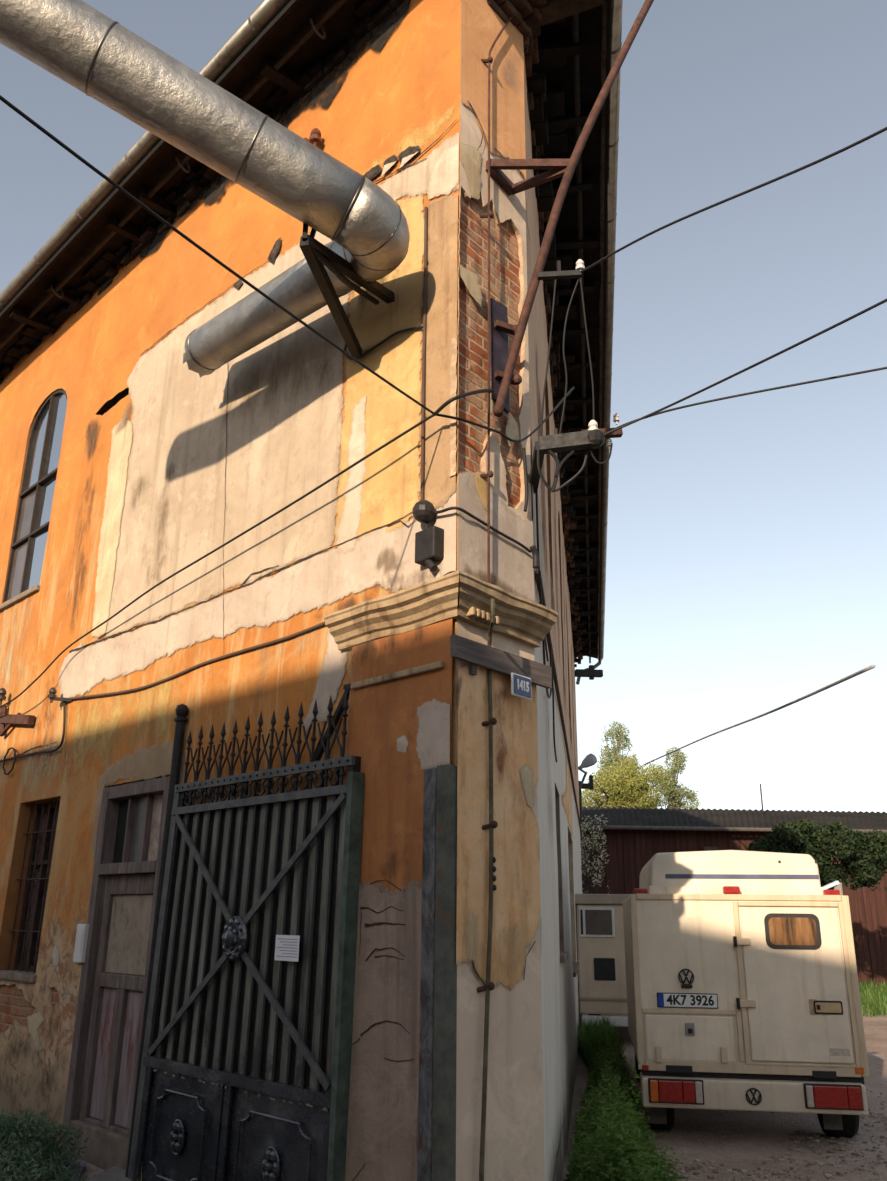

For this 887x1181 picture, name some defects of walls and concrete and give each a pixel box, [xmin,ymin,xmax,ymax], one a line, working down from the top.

spalling [268,237,281,264]
spalling [449,142,526,510]
spalling [96,387,129,415]
crack [359,879,406,961]
spalling [0,984,60,1052]
crack [352,1021,413,1062]